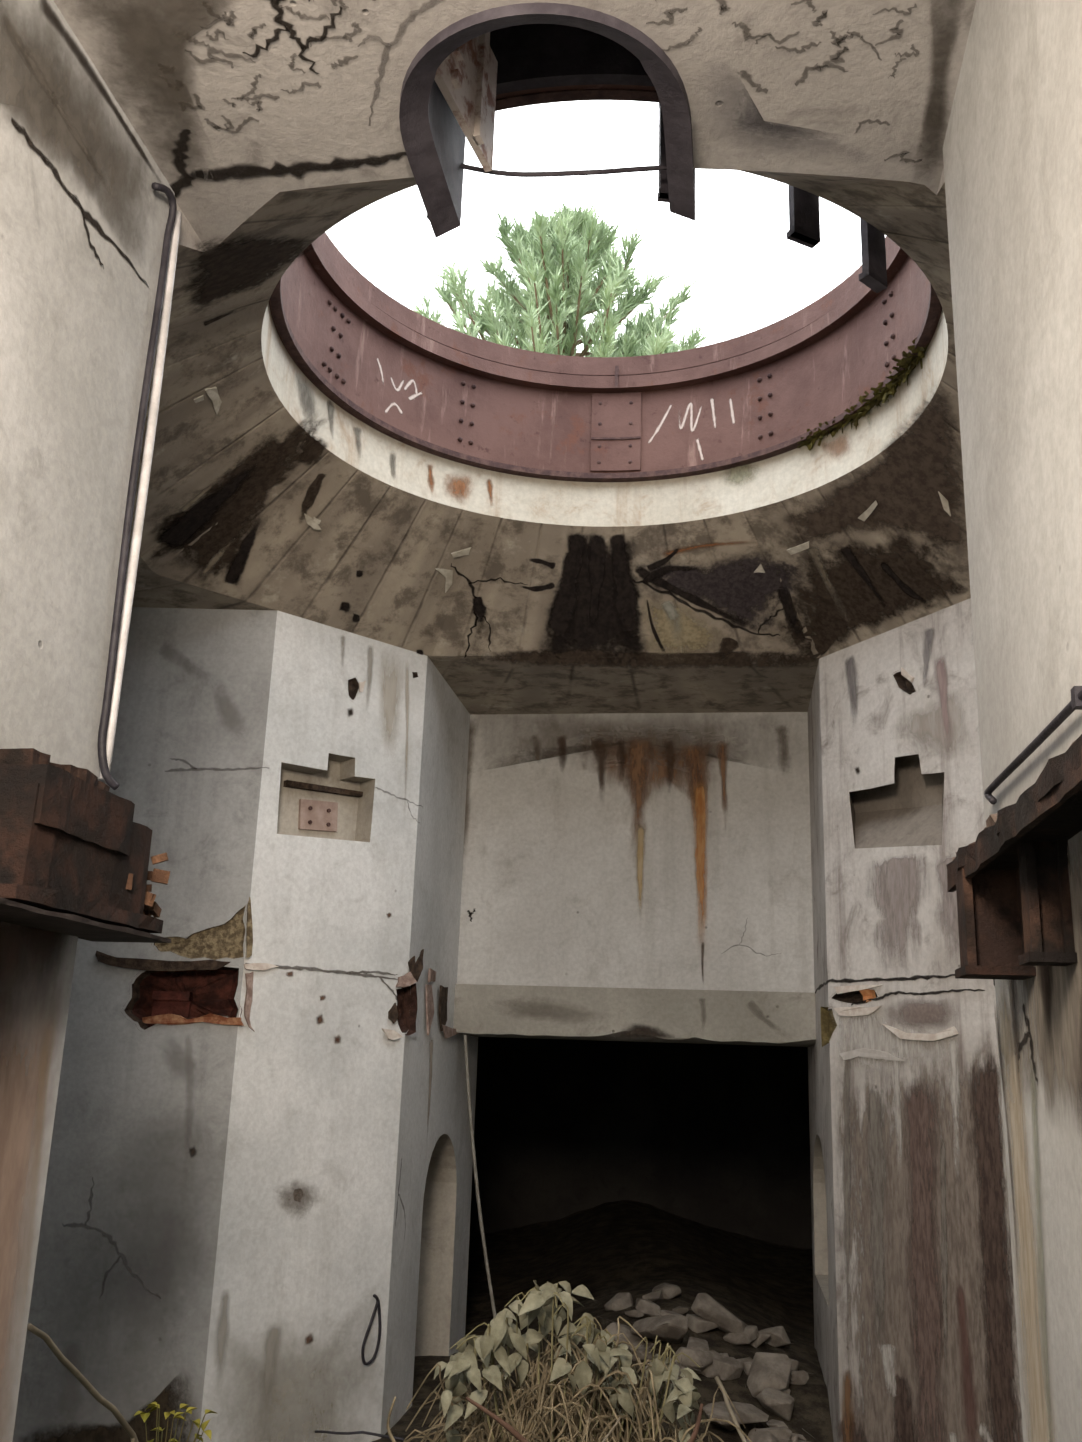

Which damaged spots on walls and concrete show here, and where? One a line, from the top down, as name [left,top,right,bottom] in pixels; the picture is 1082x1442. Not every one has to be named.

crack [170,0,441,197]
crack [646,0,919,93]
crack [11,118,149,288]
leakage [473,597,486,623]
crack [451,563,528,658]
leakage [478,534,811,668]
leakage [846,657,857,714]
leakage [911,629,960,748]
rust [594,739,726,921]
spalling [95,897,293,1032]
spalling [382,949,459,1117]
leakage [838,839,1082,1442]